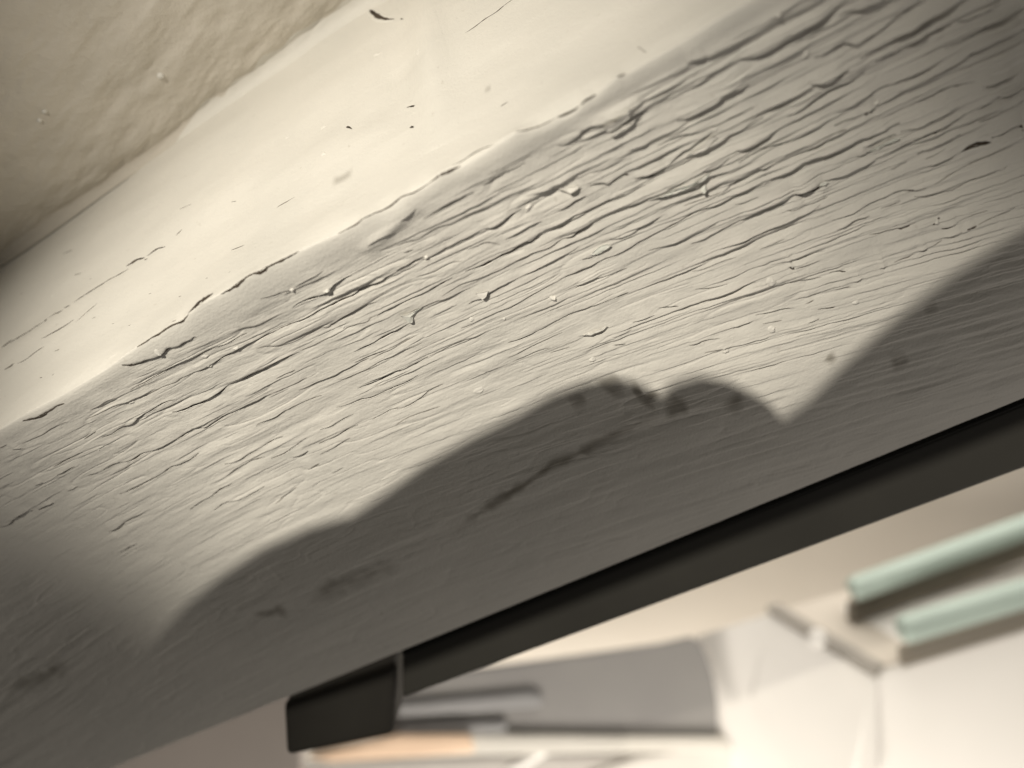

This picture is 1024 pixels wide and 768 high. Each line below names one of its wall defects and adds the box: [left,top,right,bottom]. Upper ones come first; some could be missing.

crack [1,0,1024,527]